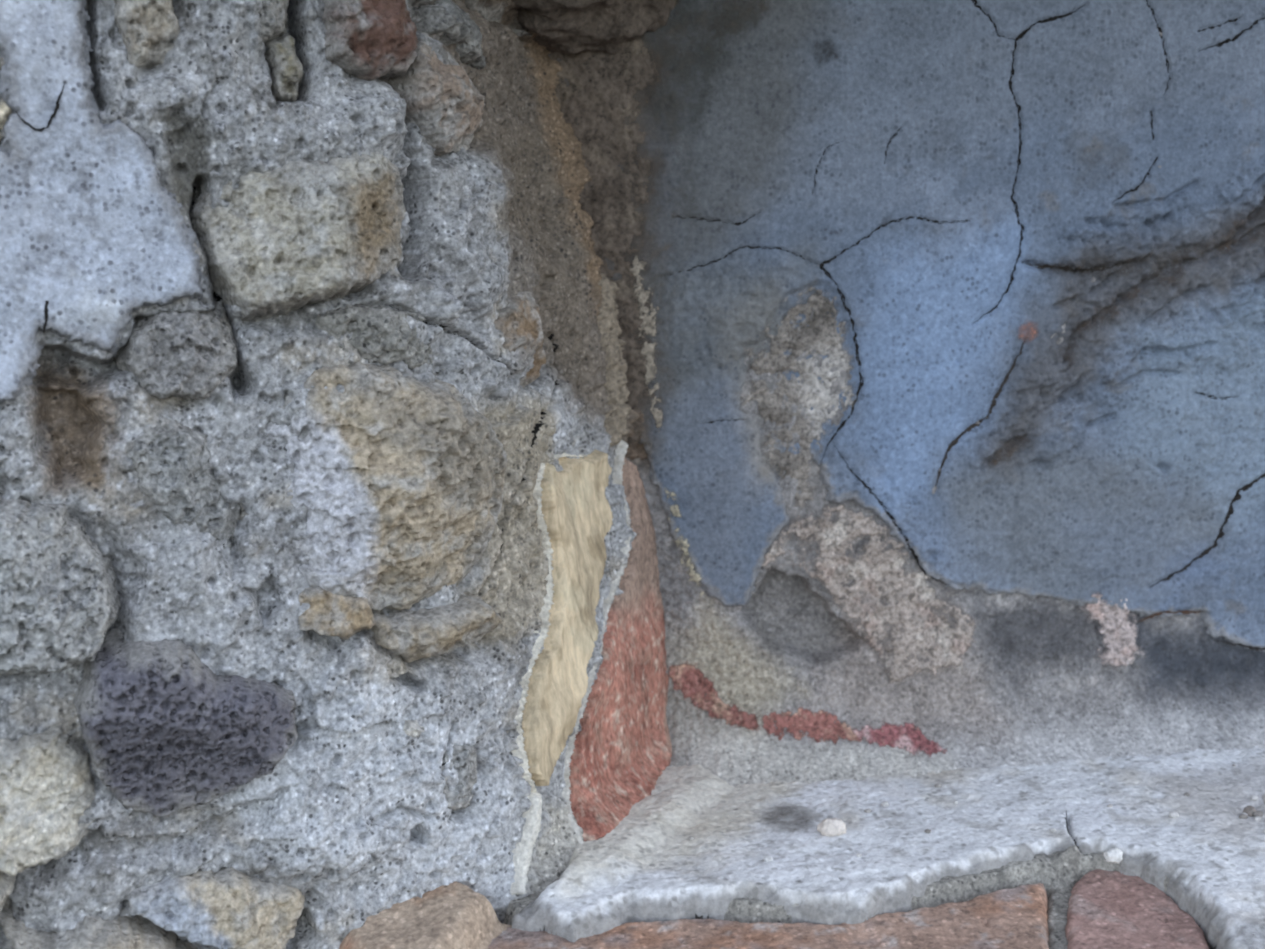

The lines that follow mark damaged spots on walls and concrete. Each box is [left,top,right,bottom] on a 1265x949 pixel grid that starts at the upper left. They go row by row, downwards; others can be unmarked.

crack [971,0,1131,323]
crack [1113,0,1171,202]
crack [1198,17,1265,52]
crack [661,213,970,585]
crack [935,341,1025,487]
peeling [507,273,975,844]
spalling [1082,594,1144,667]
crack [1139,473,1265,621]
crack [1215,640,1265,651]